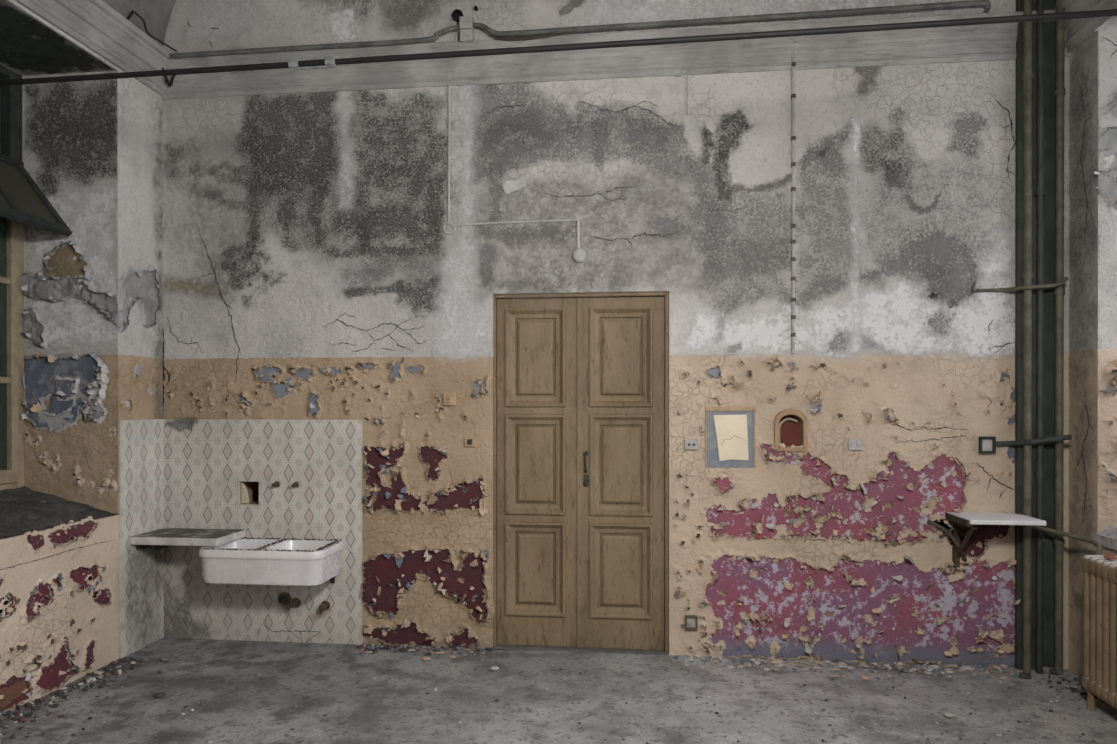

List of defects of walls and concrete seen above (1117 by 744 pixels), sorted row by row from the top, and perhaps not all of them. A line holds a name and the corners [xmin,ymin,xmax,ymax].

damp [329,0,367,42]
damp [559,0,936,33]
damp [856,66,879,93]
damp [25,72,117,354]
damp [158,83,1015,359]
peeling [21,240,163,433]
crack [192,225,240,373]
crack [323,313,432,352]
peeling [362,414,490,518]
peeling [0,560,112,626]
peeling [359,543,494,652]
peeling [697,437,1021,667]